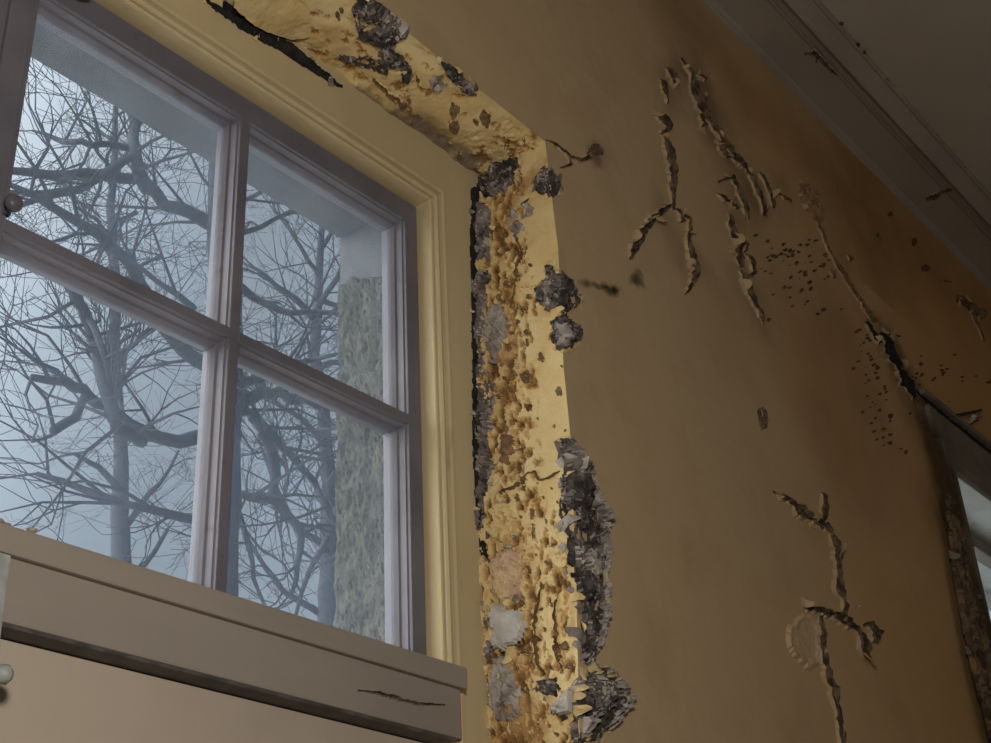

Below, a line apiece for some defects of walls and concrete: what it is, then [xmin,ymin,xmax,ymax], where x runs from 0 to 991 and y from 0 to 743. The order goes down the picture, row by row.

peeling [203,0,311,41]
spalling [335,0,479,96]
peeling [437,102,460,139]
peeling [473,108,491,129]
crack [545,139,591,169]
crack [627,57,792,327]
flaking render [469,137,584,533]
crack [817,222,916,401]
crack [358,689,445,706]
spalling [476,424,630,743]
crack [771,486,885,743]
damp [905,355,991,670]